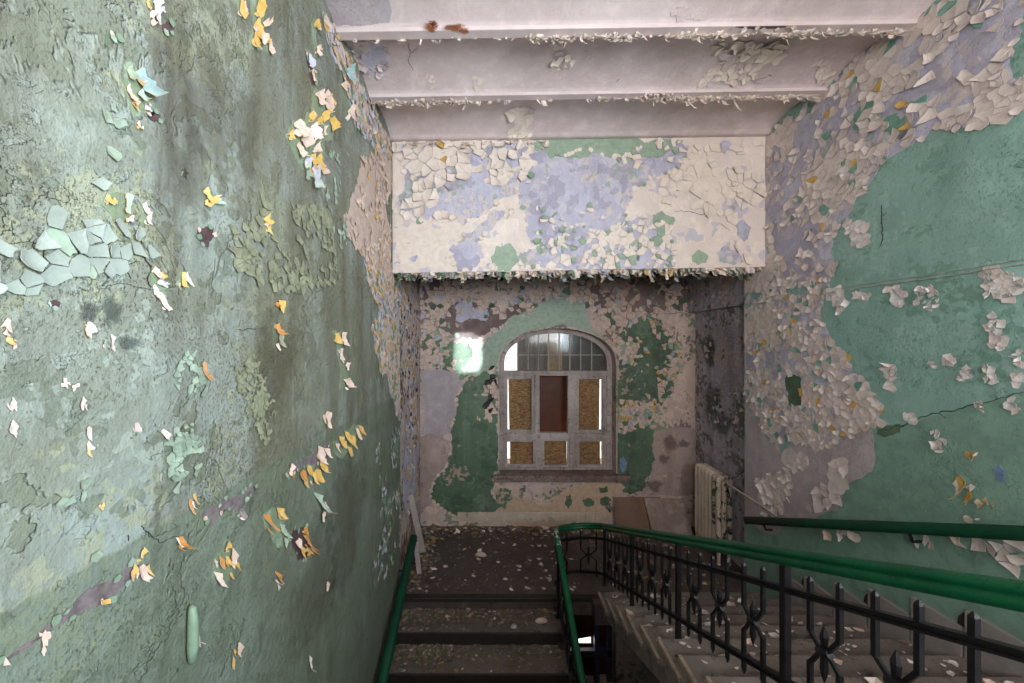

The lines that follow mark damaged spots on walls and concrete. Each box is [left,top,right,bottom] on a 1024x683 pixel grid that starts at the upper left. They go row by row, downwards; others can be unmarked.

spalling [146,0,175,36]
rust [425,21,468,34]
peeling [103,61,169,130]
peeling [0,177,194,311]
crack [879,205,887,246]
peeling [229,0,1024,587]
peeling [85,322,116,351]
crack [880,392,1023,431]
peeling [161,423,258,527]
peeling [211,539,244,588]
spalling [0,547,155,666]
peeling [186,604,205,665]